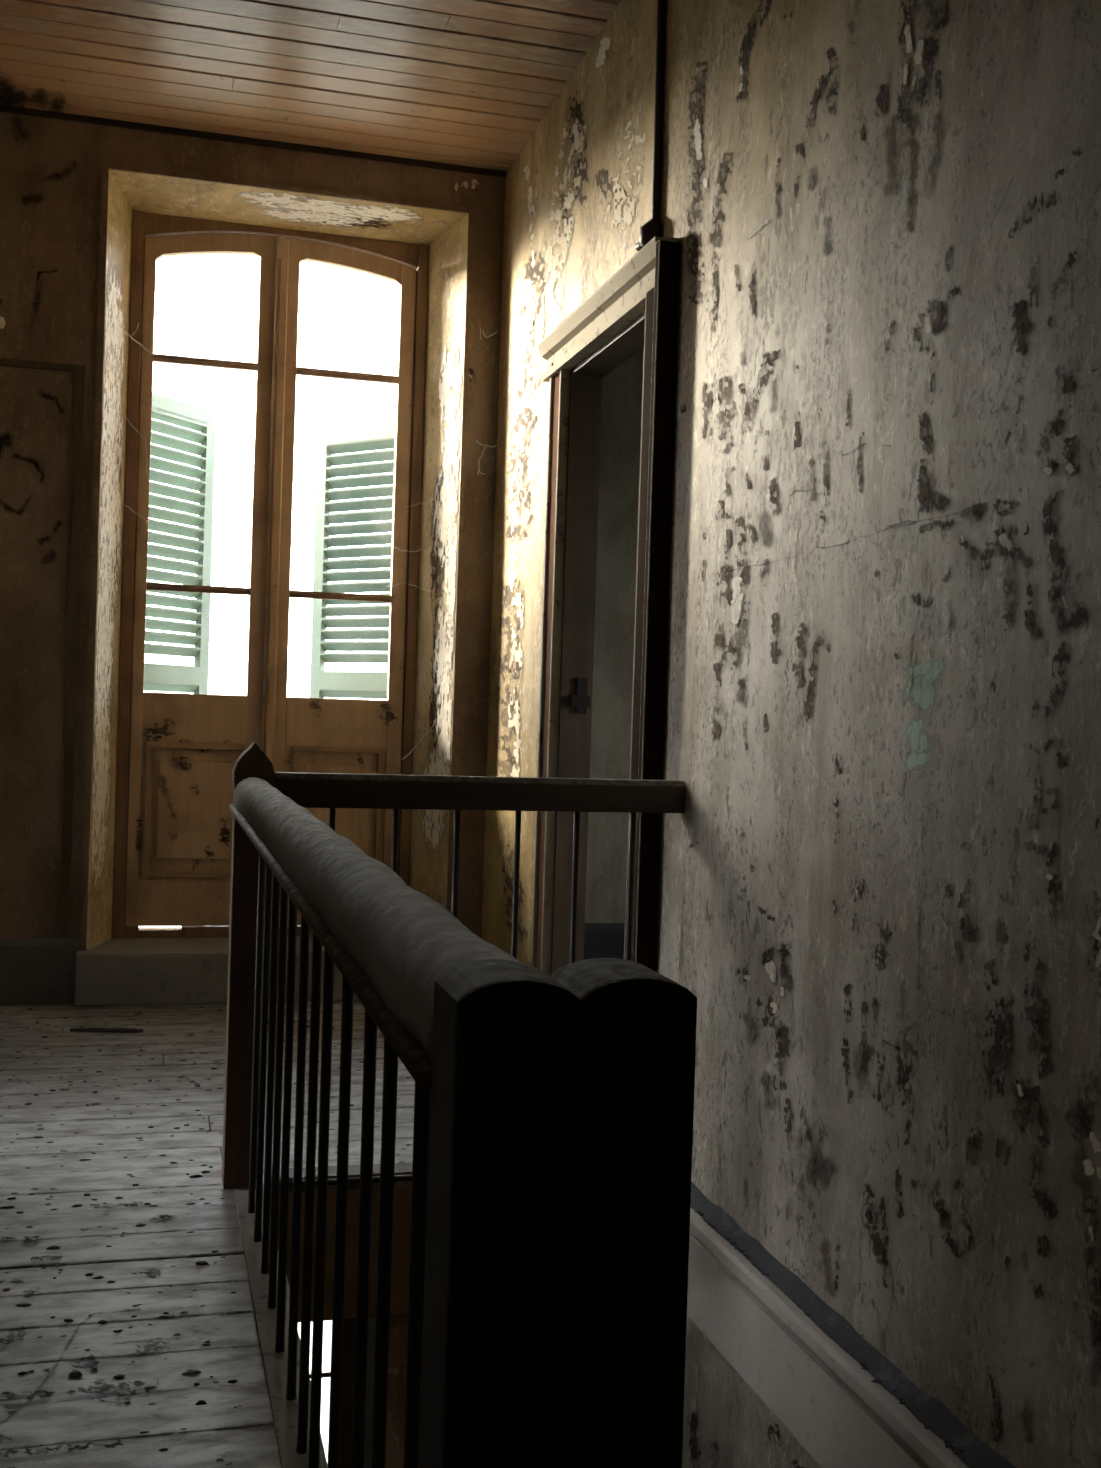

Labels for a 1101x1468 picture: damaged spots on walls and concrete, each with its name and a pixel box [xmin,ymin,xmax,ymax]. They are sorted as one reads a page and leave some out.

water stain [0,77,65,137]
peeling [686,61,757,332]
peeling [747,47,838,239]
flaking render [860,0,949,141]
flaking render [884,246,957,392]
peeling [423,339,473,776]
peeling [495,91,647,777]
peeling [918,366,1087,720]
flaking render [737,906,793,1133]
peeling [841,984,918,1145]
peeling [863,1168,916,1296]
peeling [932,943,1058,1299]